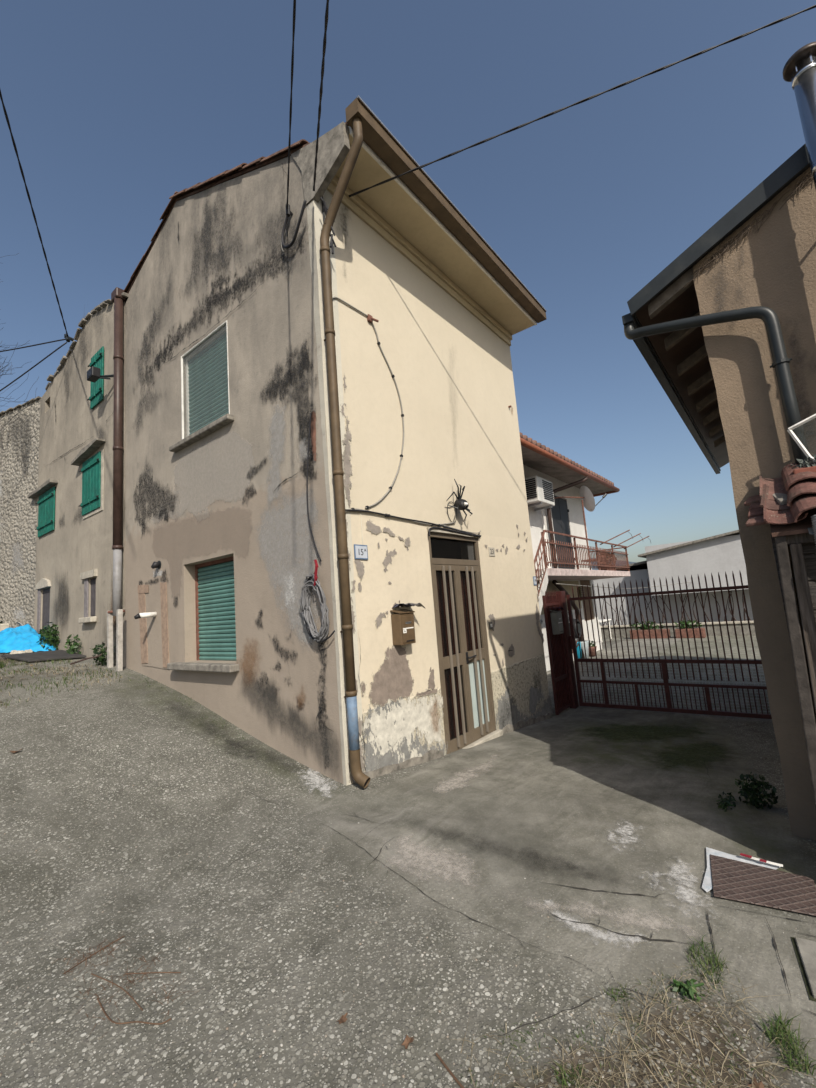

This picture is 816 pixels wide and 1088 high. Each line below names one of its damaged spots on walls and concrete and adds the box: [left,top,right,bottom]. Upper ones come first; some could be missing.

leakage [137,203,304,425]
leakage [261,341,316,479]
leakage [134,468,175,534]
peeling [366,519,411,585]
leakage [244,637,338,797]
peeling [349,645,451,784]
peeling [495,684,552,730]
crack [225,783,666,1046]
crack [536,881,816,1014]